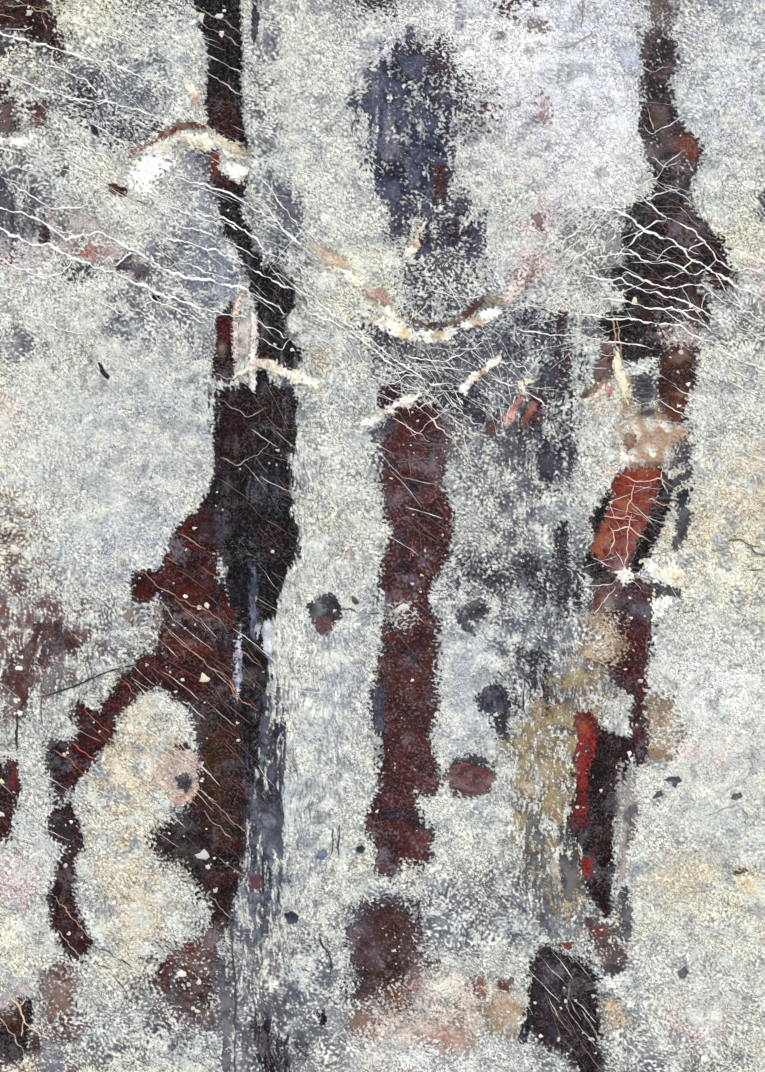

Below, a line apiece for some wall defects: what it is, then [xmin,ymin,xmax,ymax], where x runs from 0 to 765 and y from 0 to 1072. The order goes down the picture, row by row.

corrosion [0,505,251,1072]
crack [0,533,322,1072]
leakage [250,0,263,43]
crack [399,601,450,671]
corrosion [340,396,530,1072]
leakage [338,0,589,508]
corrosion [591,339,621,385]
corrosion [654,340,700,552]